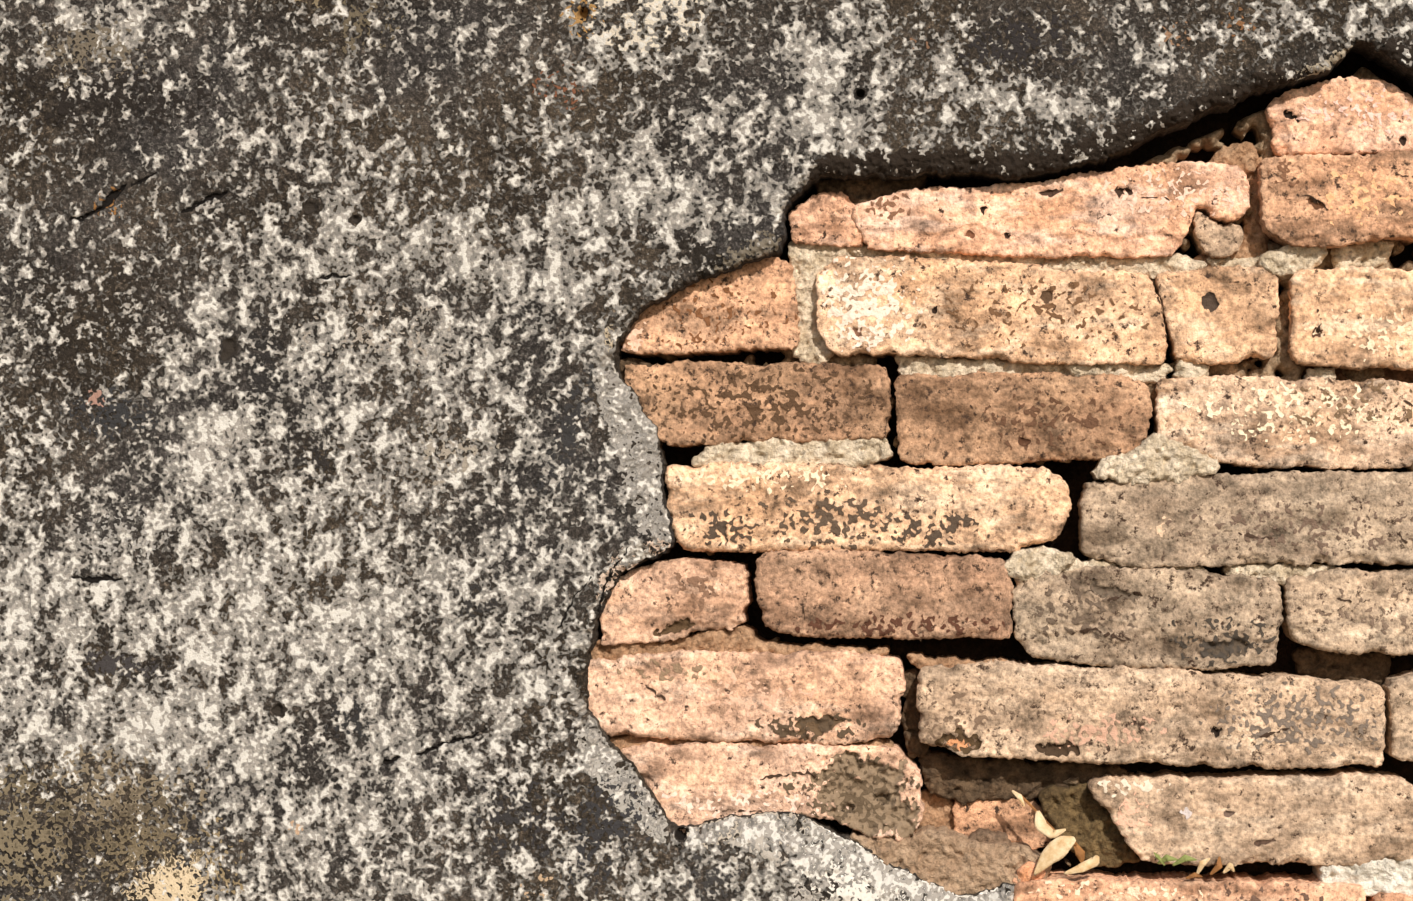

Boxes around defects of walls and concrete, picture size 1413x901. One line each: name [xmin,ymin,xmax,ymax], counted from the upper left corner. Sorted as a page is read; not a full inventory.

spalling [1379,35,1413,70]
spalling [807,45,1353,180]
crack [69,172,157,222]
crack [181,191,227,213]
peeling [1039,189,1062,197]
peeling [1114,186,1133,198]
peeling [1040,289,1053,304]
peeling [1202,292,1220,312]
spalling [593,324,671,605]
peeling [653,617,696,636]
peeling [1035,740,1080,758]
peeling [574,727,1014,901]